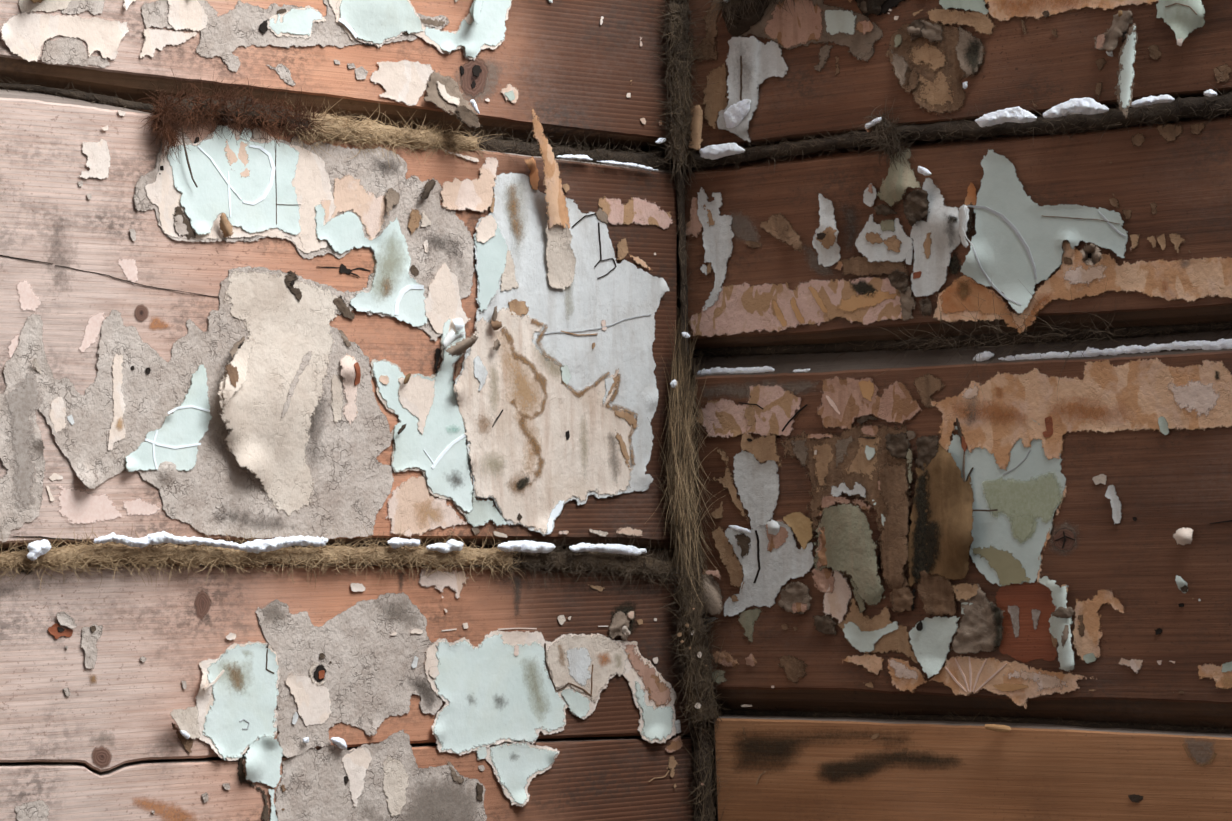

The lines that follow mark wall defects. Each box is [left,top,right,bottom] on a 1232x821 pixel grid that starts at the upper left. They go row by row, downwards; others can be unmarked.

peeling [1156,0,1205,46]
peeling [485,84,518,103]
peeling [79,125,111,179]
peeling [863,183,877,207]
peeling [812,193,843,270]
crack [0,255,218,297]
peeling [222,338,255,405]
peeling [1092,474,1122,524]
peeling [589,526,642,537]
peeling [1119,658,1175,673]
water stain [738,736,806,769]
water stain [821,732,958,782]